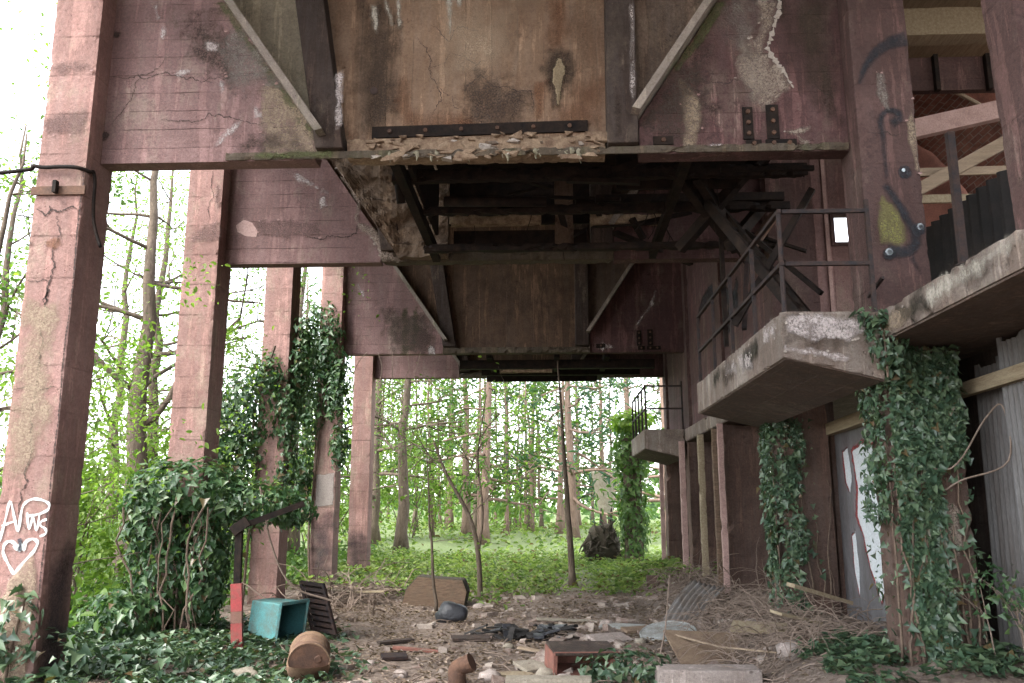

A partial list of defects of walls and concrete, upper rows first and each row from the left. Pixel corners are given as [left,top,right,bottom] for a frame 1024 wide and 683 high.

crack [112,59,290,125]
damp [182,13,241,89]
damp [358,0,401,127]
crack [418,26,536,112]
damp [446,0,574,124]
peeling [734,0,794,105]
spalling [335,130,543,261]
spalling [557,131,607,163]
peeling [763,313,865,361]
crack [13,166,85,623]